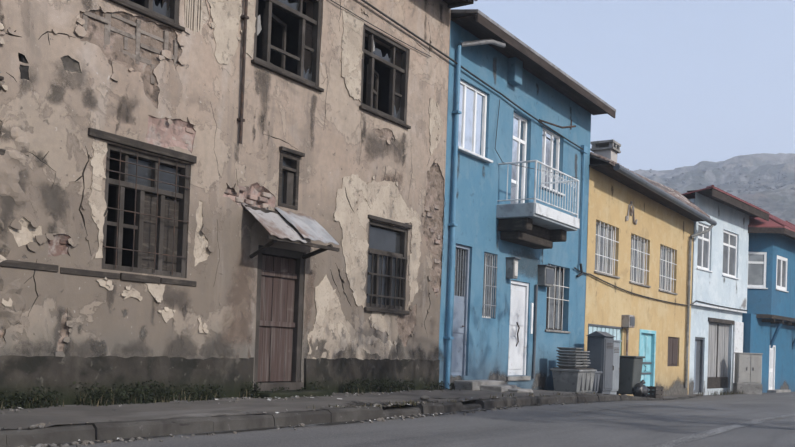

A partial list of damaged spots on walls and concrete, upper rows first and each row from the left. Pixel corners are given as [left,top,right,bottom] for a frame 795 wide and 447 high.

peeling [177,27,191,46]
hole [61,55,82,73]
water stain [362,121,405,163]
crack [75,146,94,253]
flaking render [96,277,176,323]
crack [330,267,351,305]
flaking render [307,174,422,360]